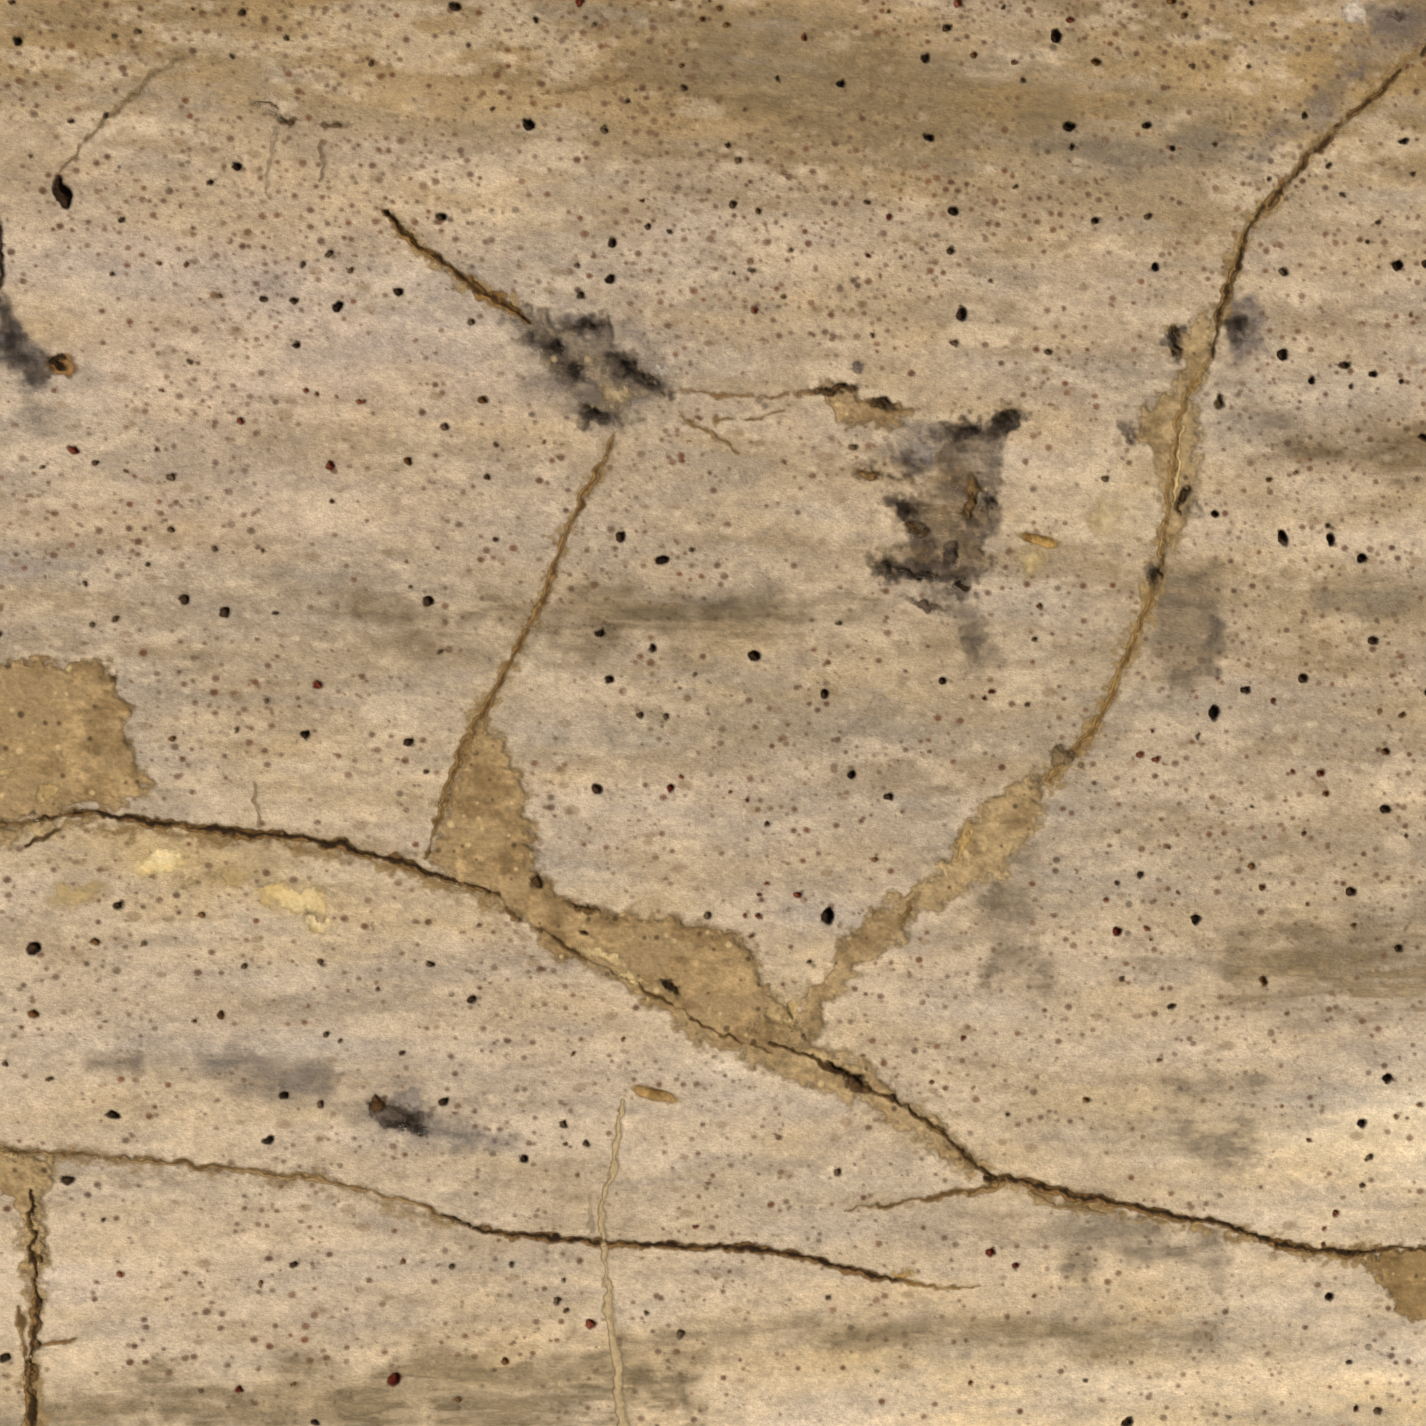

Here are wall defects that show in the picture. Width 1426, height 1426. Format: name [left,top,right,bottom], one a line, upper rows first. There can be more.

crack [0,225,8,288]
crack [381,209,531,325]
water stain [523,326,665,414]
crack [680,387,822,455]
crack [1043,45,1426,796]
spalling [0,655,155,846]
spalling [132,849,195,889]
spalling [258,883,330,934]
crack [0,432,1426,1268]
spalling [423,721,1056,1172]
crack [0,1099,979,1426]
spalling [1348,1243,1426,1322]